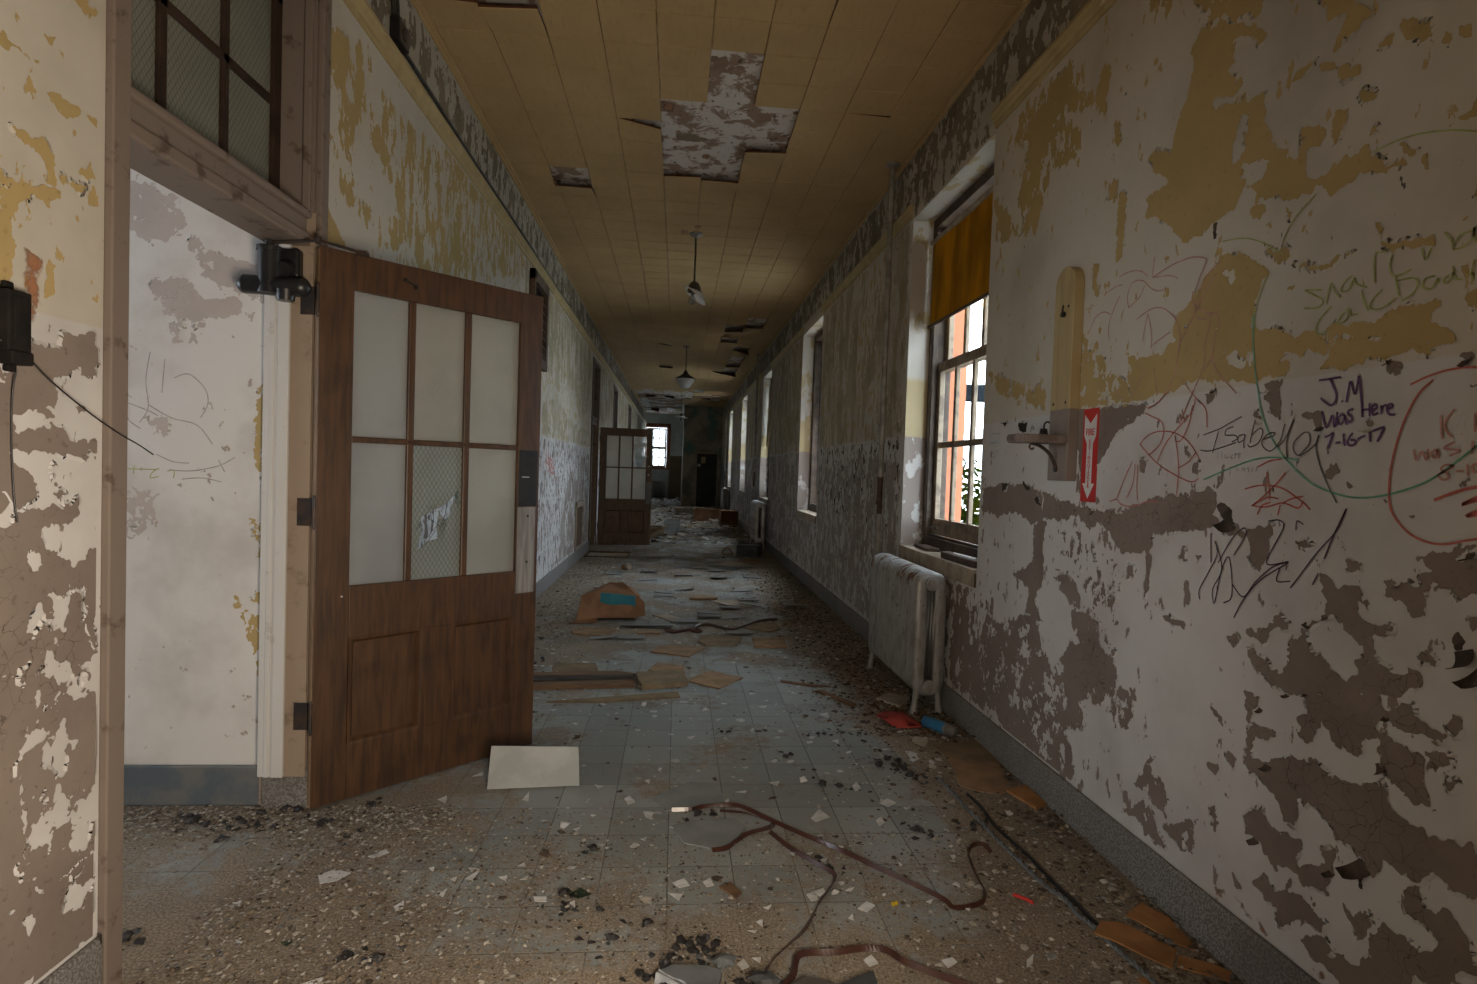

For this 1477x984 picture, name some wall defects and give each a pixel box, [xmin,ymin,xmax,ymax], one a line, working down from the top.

peeling [0,122,97,281]
peeling [47,91,97,128]
peeling [252,383,263,490]
peeling [328,0,645,594]
peeling [722,0,1089,618]
peeling [994,57,1123,245]
peeling [1077,0,1477,483]
peeling [0,329,100,984]
peeling [233,590,260,677]
peeling [943,459,1277,780]
peeling [1121,755,1219,854]
peeling [1206,540,1477,984]